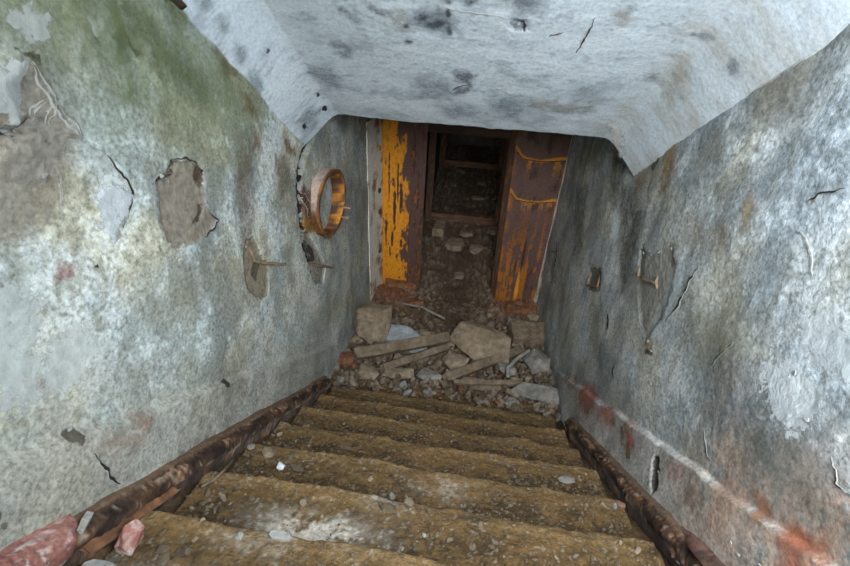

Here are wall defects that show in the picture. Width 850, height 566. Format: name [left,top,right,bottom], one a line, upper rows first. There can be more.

water stain [404,0,452,35]
spalling [157,160,215,248]
crack [807,187,845,202]
spalling [243,238,286,300]
crack [666,266,700,320]
crack [93,453,121,485]
spalling [652,454,660,492]